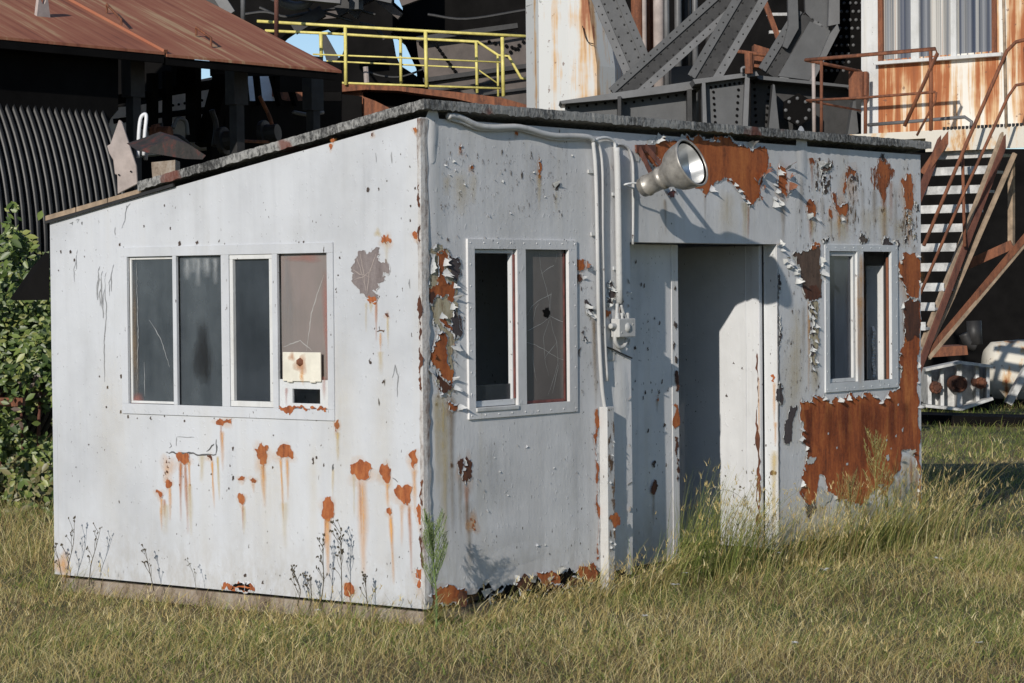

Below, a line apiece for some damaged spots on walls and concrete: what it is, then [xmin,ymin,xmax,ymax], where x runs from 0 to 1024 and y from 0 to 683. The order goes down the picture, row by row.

peeling [350,247,390,309]
peeling [775,153,919,445]
peeling [428,233,465,434]
corrosion [799,158,924,519]
corrosion [156,452,190,504]
corrosion [237,443,293,505]
corrosion [321,496,334,541]
corrosion [344,582,355,598]
peeling [482,566,595,605]